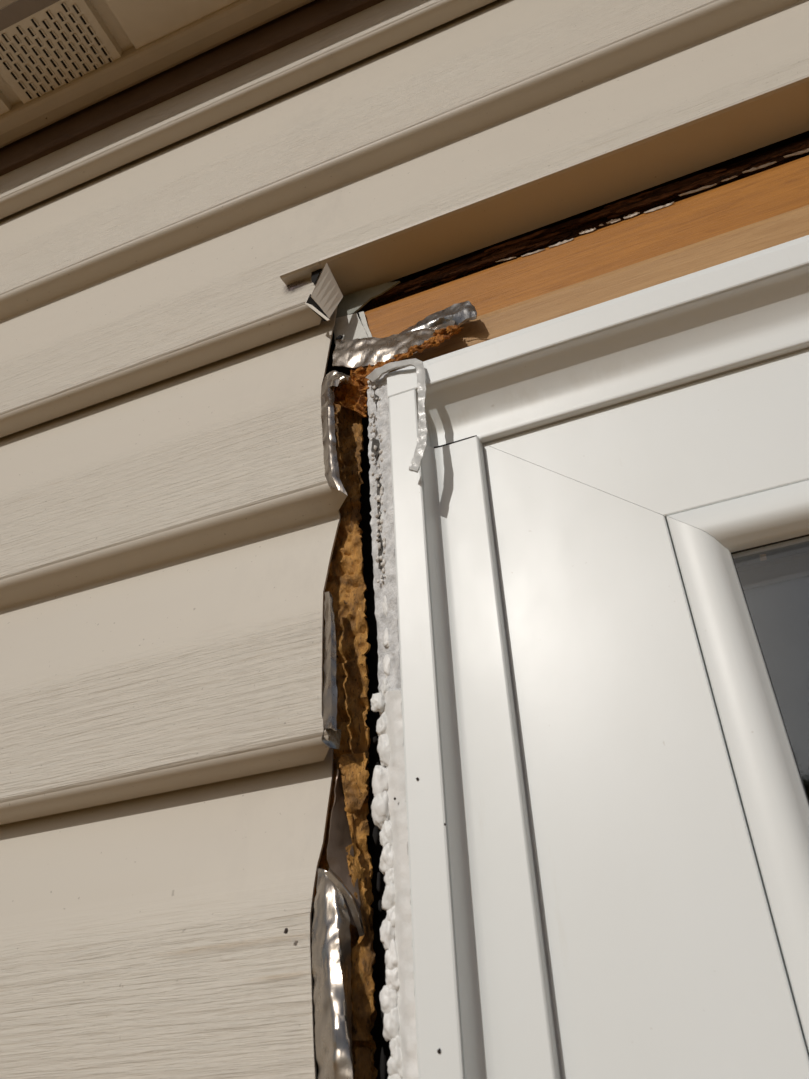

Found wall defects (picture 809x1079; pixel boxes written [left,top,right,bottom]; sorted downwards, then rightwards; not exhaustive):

peeling [366,358,428,473]